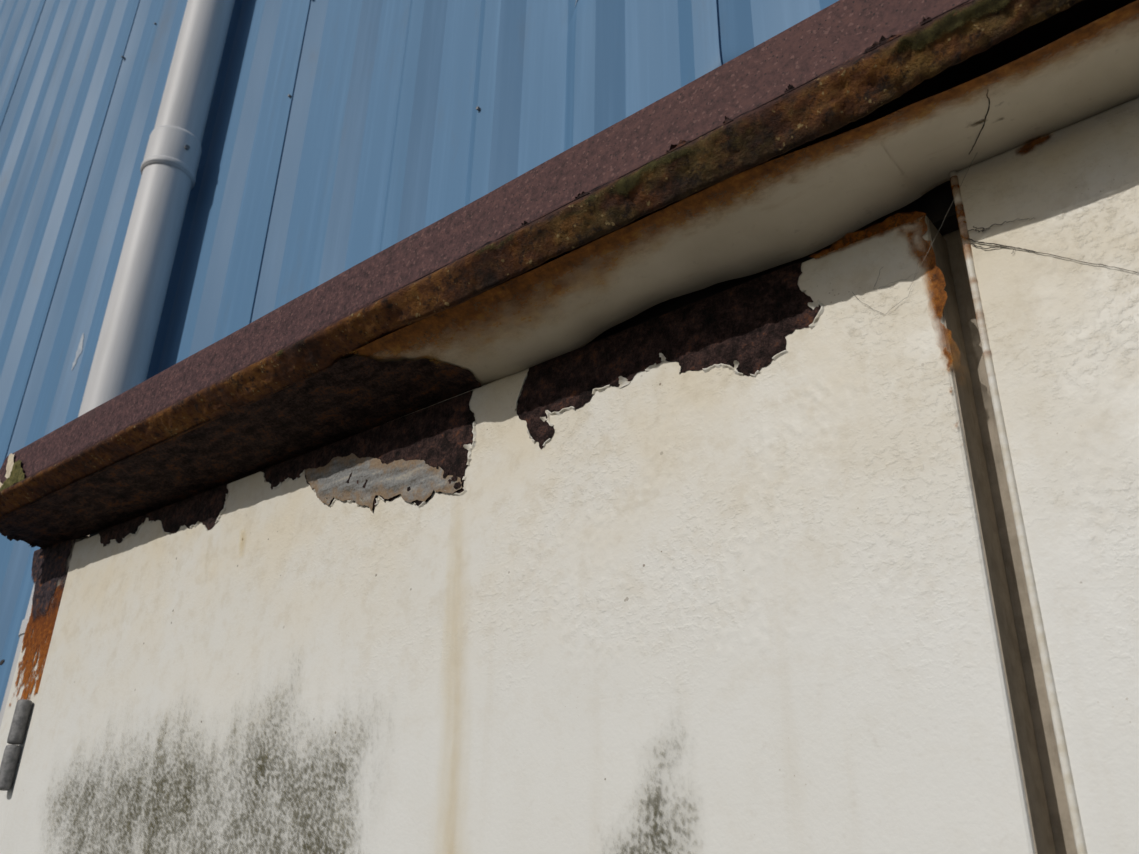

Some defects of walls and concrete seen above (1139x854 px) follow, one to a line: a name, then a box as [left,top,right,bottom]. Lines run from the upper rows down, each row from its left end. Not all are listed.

corrosion [515,211,953,449]
corrosion [352,0,1139,362]
corrosion [0,356,481,700]